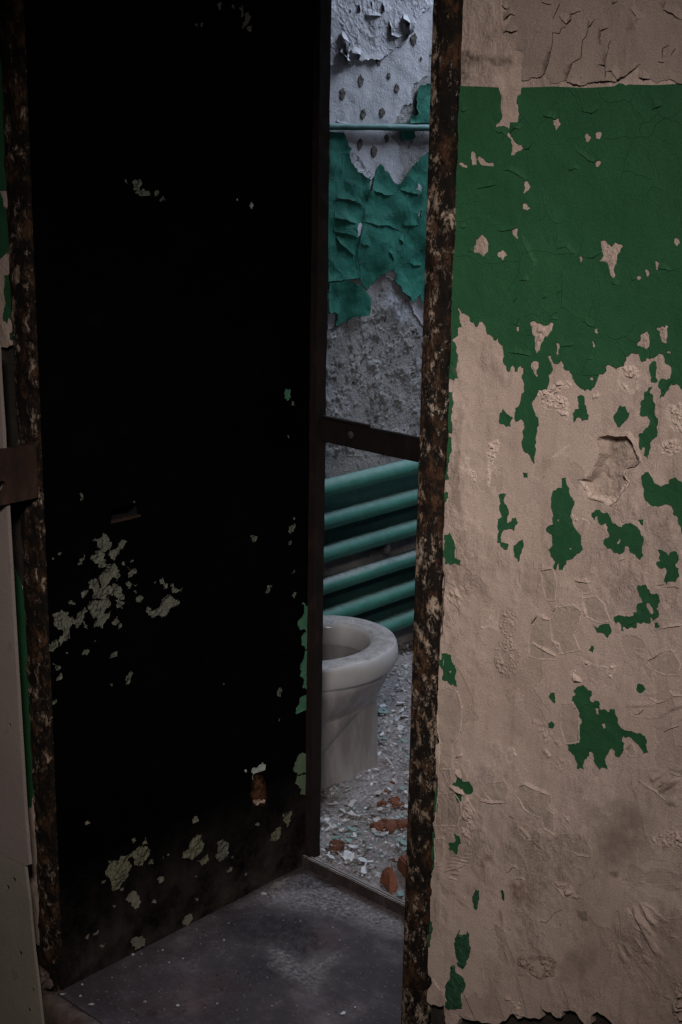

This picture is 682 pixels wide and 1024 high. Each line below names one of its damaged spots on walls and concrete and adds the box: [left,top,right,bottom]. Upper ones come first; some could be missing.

crack [542,2,611,78]
peeling [326,0,433,436]
peeling [443,0,682,770]
spalling [325,443,390,457]
peeling [49,533,183,681]
peeling [102,837,169,909]
peeling [182,816,234,877]
peeling [271,811,292,842]
peeling [130,936,145,956]
crack [432,978,475,1021]